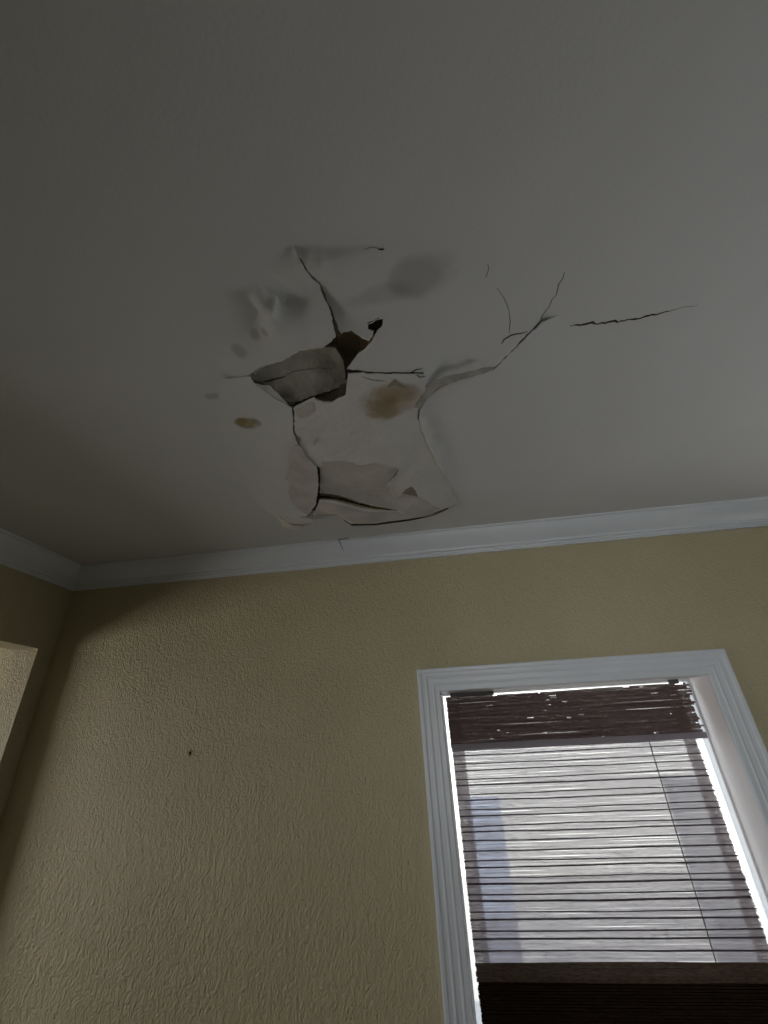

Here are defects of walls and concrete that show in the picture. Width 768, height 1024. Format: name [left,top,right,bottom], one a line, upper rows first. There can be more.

crack [303,265,339,335]
crack [486,266,565,369]
crack [570,304,698,327]
spalling [247,288,422,445]
crack [346,368,440,388]
spalling [320,493,398,511]